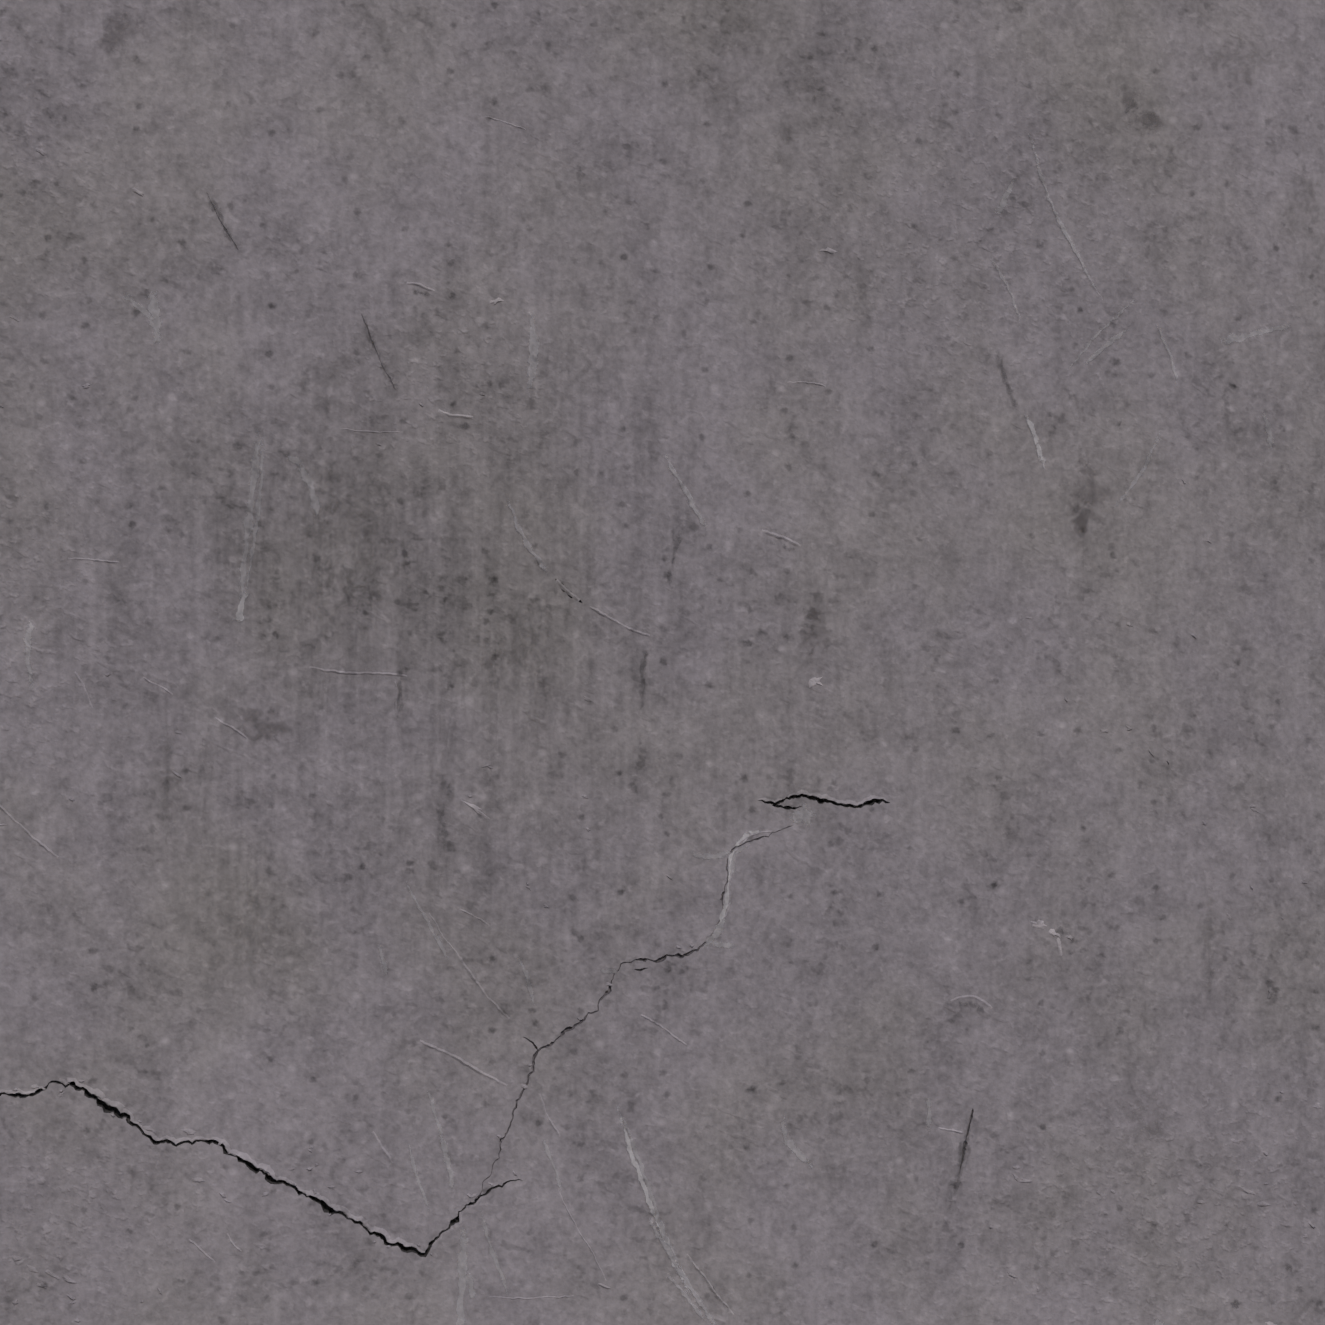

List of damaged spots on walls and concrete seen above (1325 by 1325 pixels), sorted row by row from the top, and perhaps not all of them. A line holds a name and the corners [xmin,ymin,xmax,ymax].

crack [0,789,890,1257]